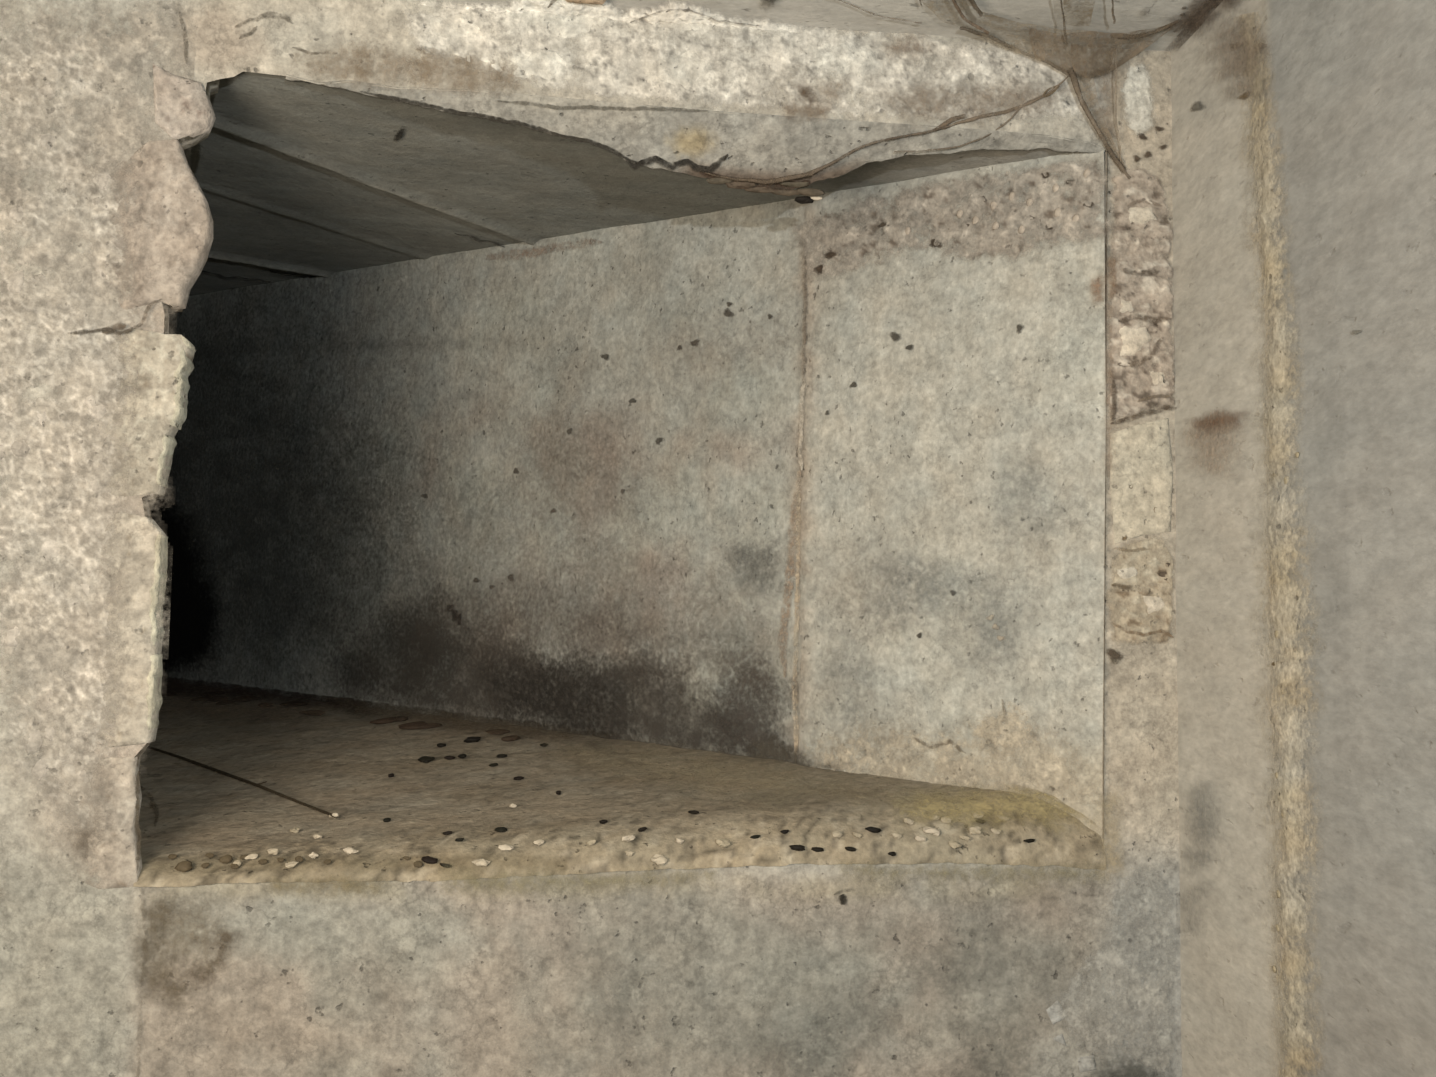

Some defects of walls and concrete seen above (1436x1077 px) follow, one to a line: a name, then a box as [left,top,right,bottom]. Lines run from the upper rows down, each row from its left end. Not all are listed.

crack [235,13,318,54]
crack [1170,0,1262,94]
flaking render [0,1,216,889]
leakage [326,595,826,788]